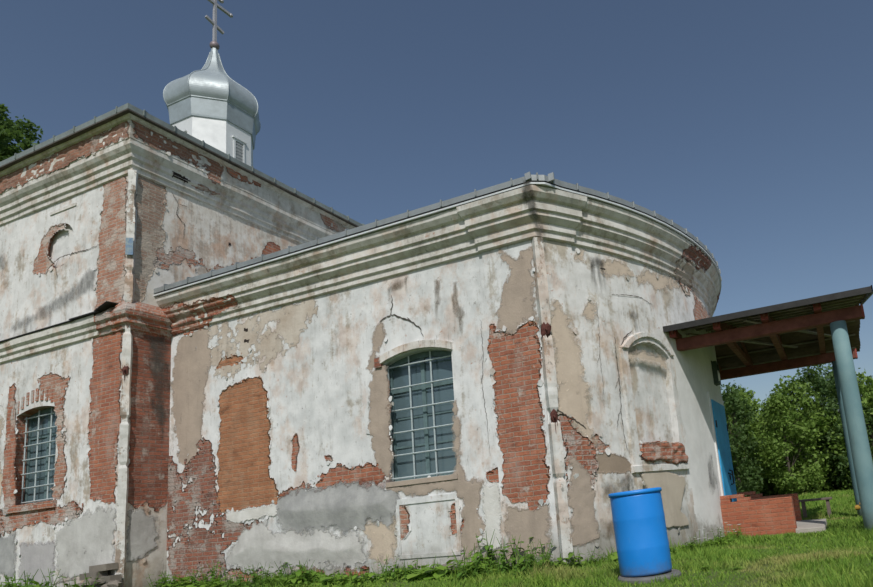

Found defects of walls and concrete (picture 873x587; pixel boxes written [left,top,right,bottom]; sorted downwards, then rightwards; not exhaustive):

flaking render [32,223,66,276]
flaking render [0,298,392,585]
crack [380,295,423,335]
flaking render [486,246,552,561]
peeling [550,296,632,490]
crack [596,294,650,450]
peeling [600,259,716,320]